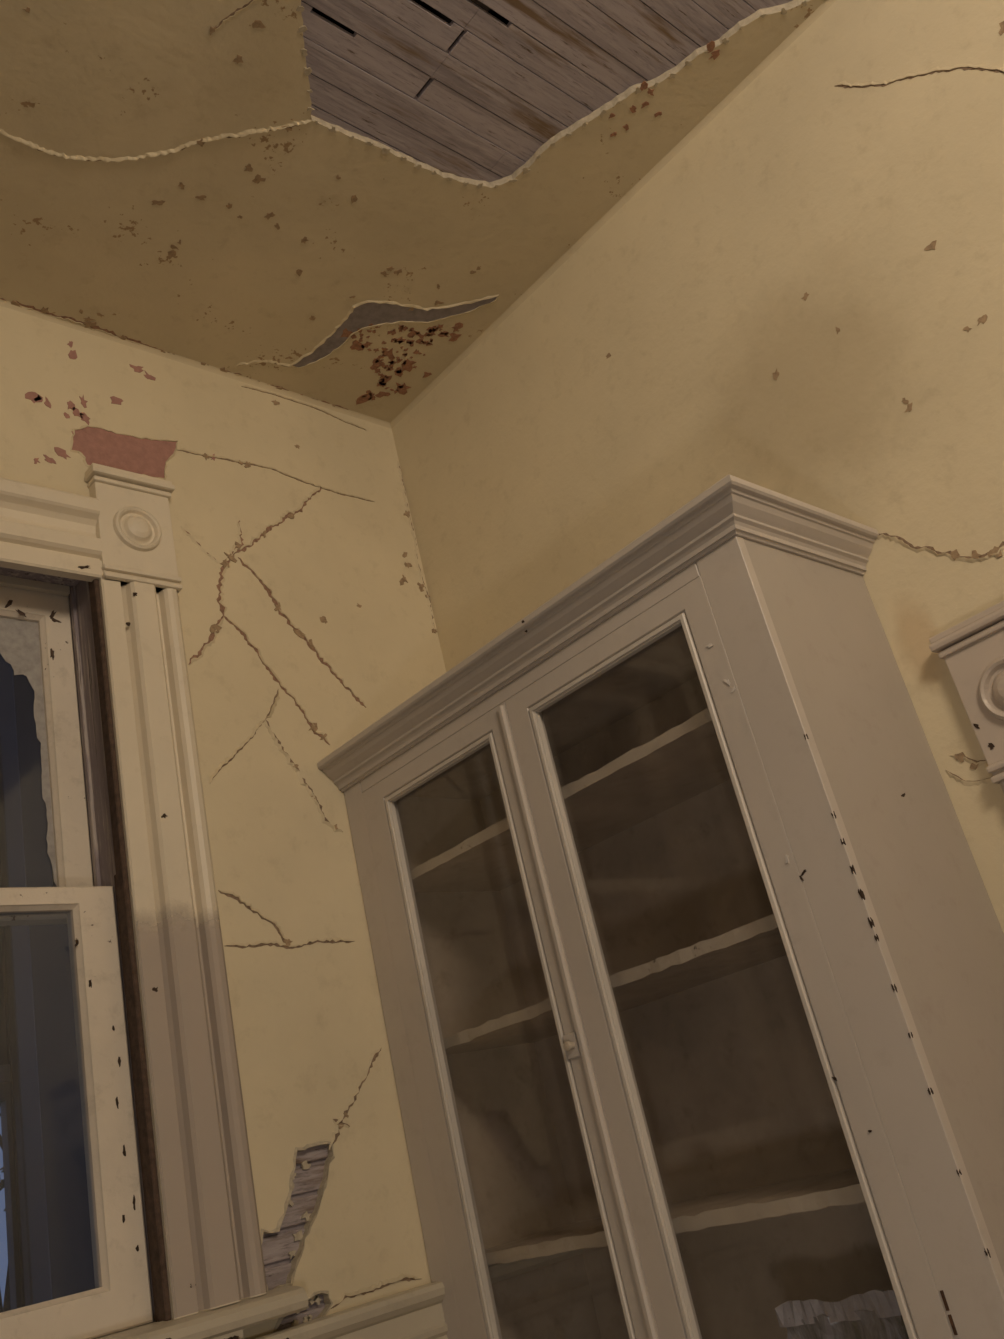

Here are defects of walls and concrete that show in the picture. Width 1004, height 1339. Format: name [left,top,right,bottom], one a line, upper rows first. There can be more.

crack [210,0,261,36]
spalling [296,0,807,189]
crack [835,63,1004,88]
peeling [129,364,156,381]
peeling [236,285,500,405]
peeling [25,392,178,480]
crack [876,533,1004,563]
crack [178,448,437,833]
crack [218,890,355,949]
crack [329,1047,381,1150]
spalling [260,1141,335,1291]